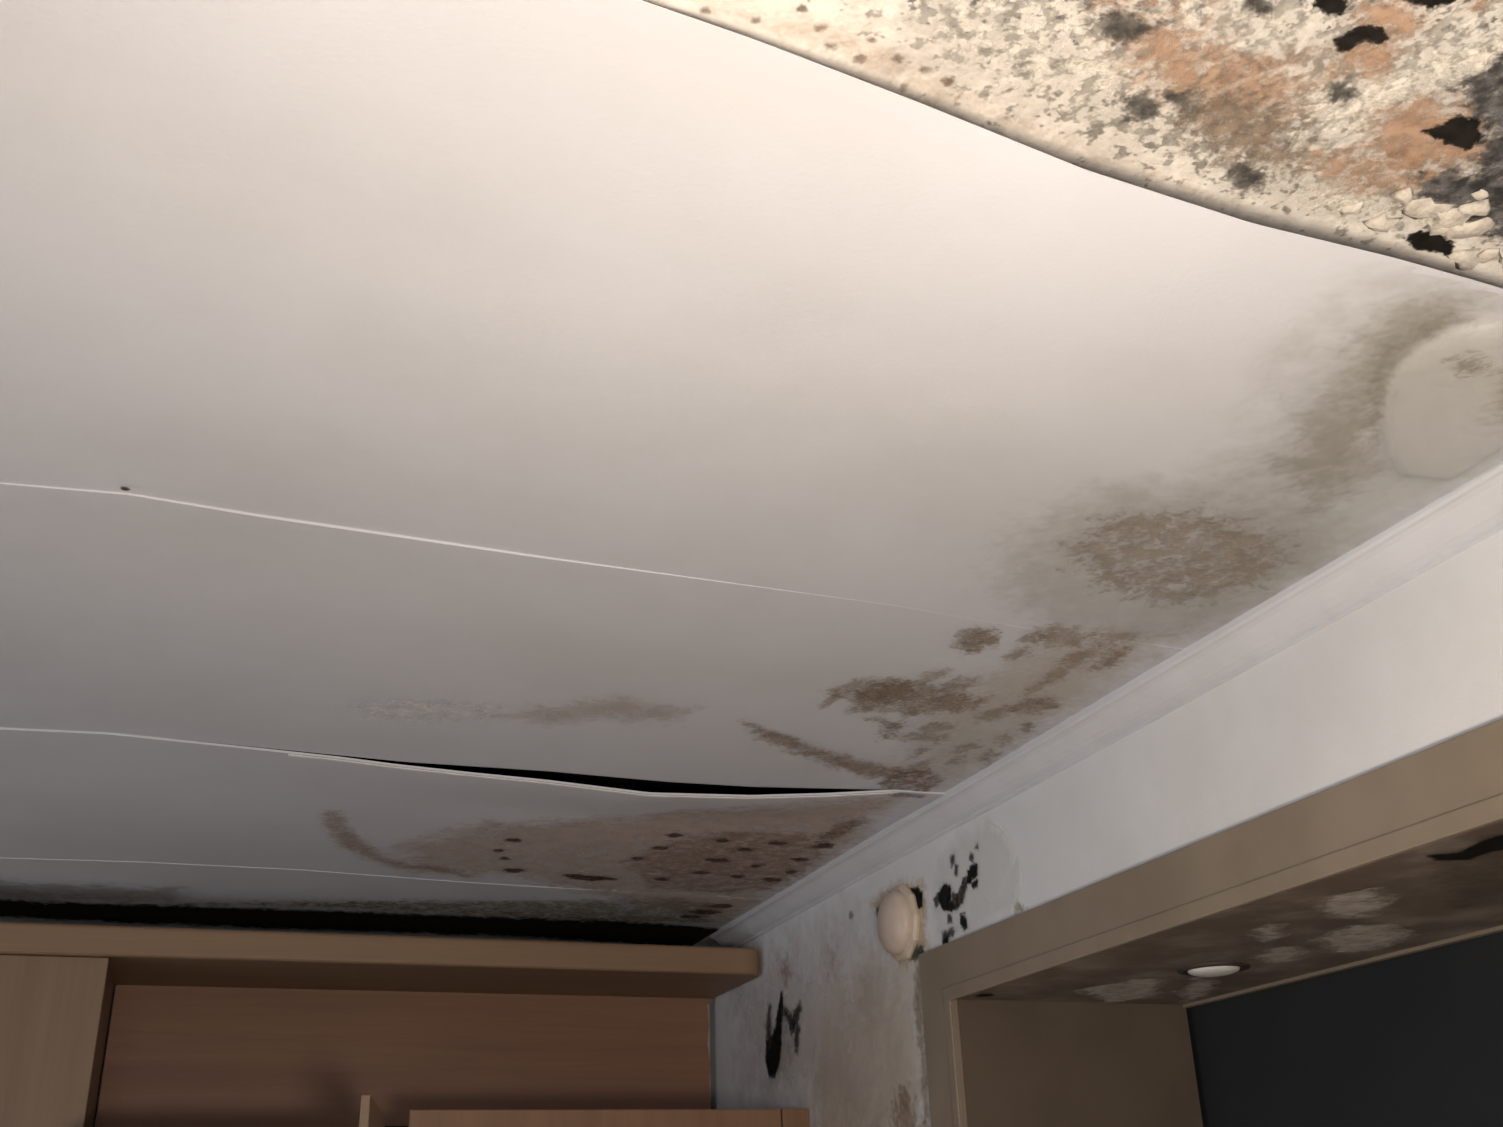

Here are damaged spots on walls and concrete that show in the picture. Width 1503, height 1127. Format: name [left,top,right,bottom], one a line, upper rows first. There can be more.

leakage [908,0,1503,270]
leakage [1073,512,1292,601]
crack [288,754,898,800]
leakage [746,724,942,798]
leakage [493,838,524,873]
leakage [632,833,683,861]
leakage [692,820,861,882]
leakage [1428,836,1503,861]
leakage [0,900,732,946]
leakage [821,845,978,1127]
leakage [765,992,801,1079]